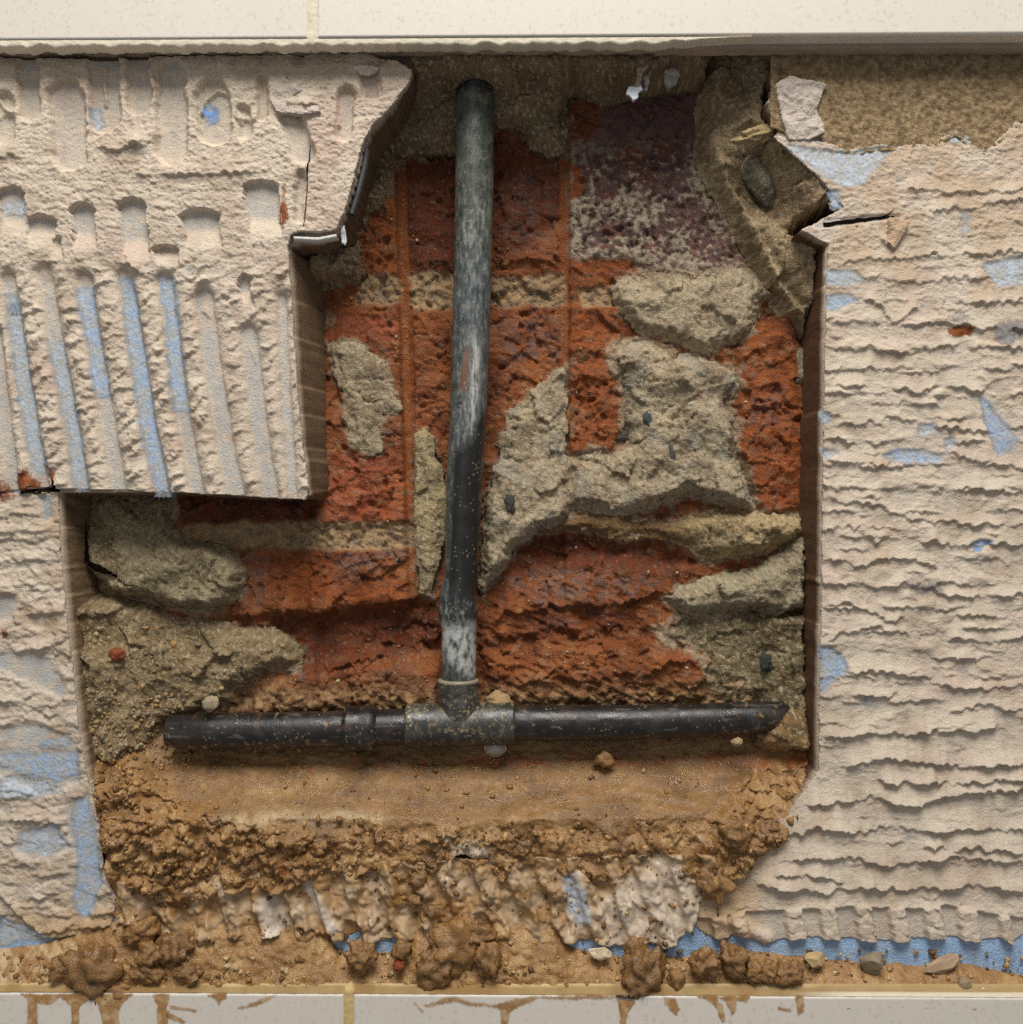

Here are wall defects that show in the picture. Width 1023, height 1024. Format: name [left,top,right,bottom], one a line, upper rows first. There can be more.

peeling [269,82,321,118]
crack [303,146,311,226]
crack [823,209,895,227]
spalling [307,53,1023,755]
spalling [46,258,306,763]
peeling [18,798,103,916]
peeling [562,873,591,925]
water stain [27,999,38,1024]
water stain [71,1002,79,1024]
water stain [99,1005,119,1024]
water stain [157,1006,196,1024]
water stain [498,1004,515,1024]